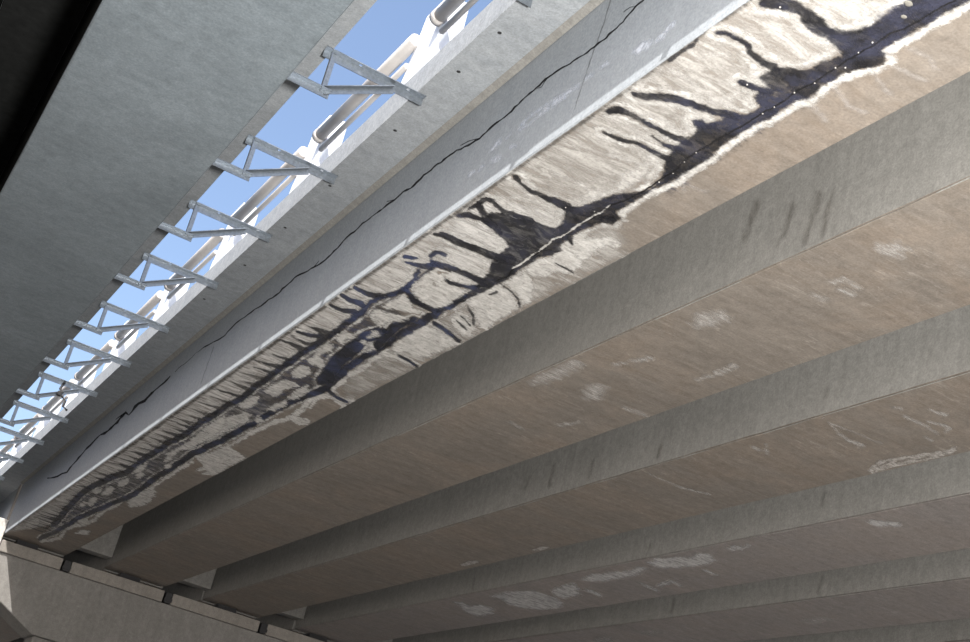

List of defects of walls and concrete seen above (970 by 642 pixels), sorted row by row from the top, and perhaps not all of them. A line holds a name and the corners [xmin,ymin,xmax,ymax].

damp [634,22,674,53]
crack [496,0,957,282]
damp [617,162,652,190]
crack [47,0,644,479]
damp [578,257,606,271]
damp [588,244,624,261]
damp [528,275,562,300]
damp [344,355,410,393]
spalling [868,447,956,474]
damp [455,553,715,616]